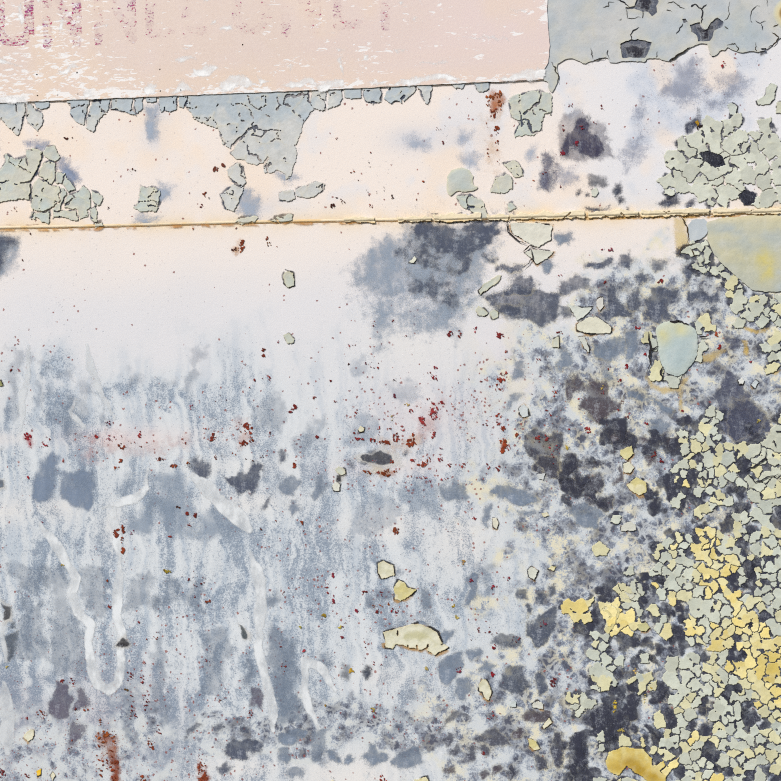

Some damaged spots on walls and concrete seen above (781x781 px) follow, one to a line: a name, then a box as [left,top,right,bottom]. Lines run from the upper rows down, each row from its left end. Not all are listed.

crack [656,1,707,61]
crack [725,1,779,51]
peeling [0,101,50,136]
peeling [67,85,432,225]
corrosion [485,90,505,164]
peeling [0,145,104,228]
corrosion [352,425,416,448]
corrosion [482,413,519,453]
water stain [33,452,95,511]
water stain [38,466,192,696]
water stain [245,552,337,733]
corrosion [95,719,119,781]